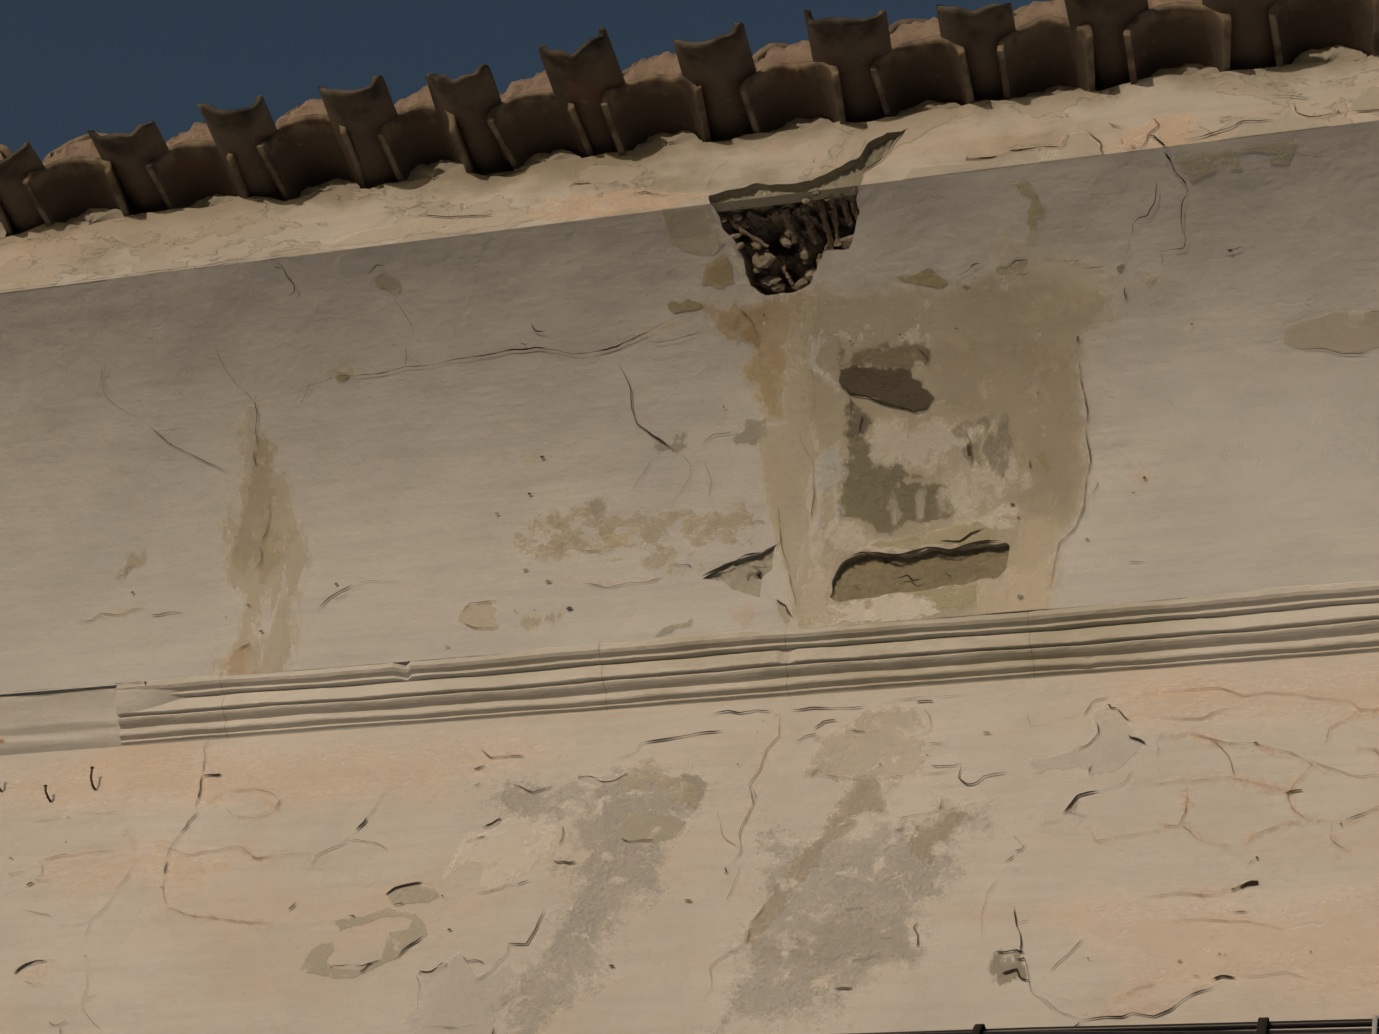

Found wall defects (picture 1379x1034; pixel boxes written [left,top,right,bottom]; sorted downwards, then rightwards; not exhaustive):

damp [220,402,307,676]
crack [290,314,711,497]
spalling [508,330,1053,622]
spalling [661,128,907,295]
crack [1083,135,1187,299]
peeling [1285,311,1379,354]
crack [10,674,387,1033]
peeling [301,758,700,1034]
crack [474,640,963,898]
peeling [709,706,1007,1033]
crack [1037,911,1312,1026]
crack [981,687,1379,925]